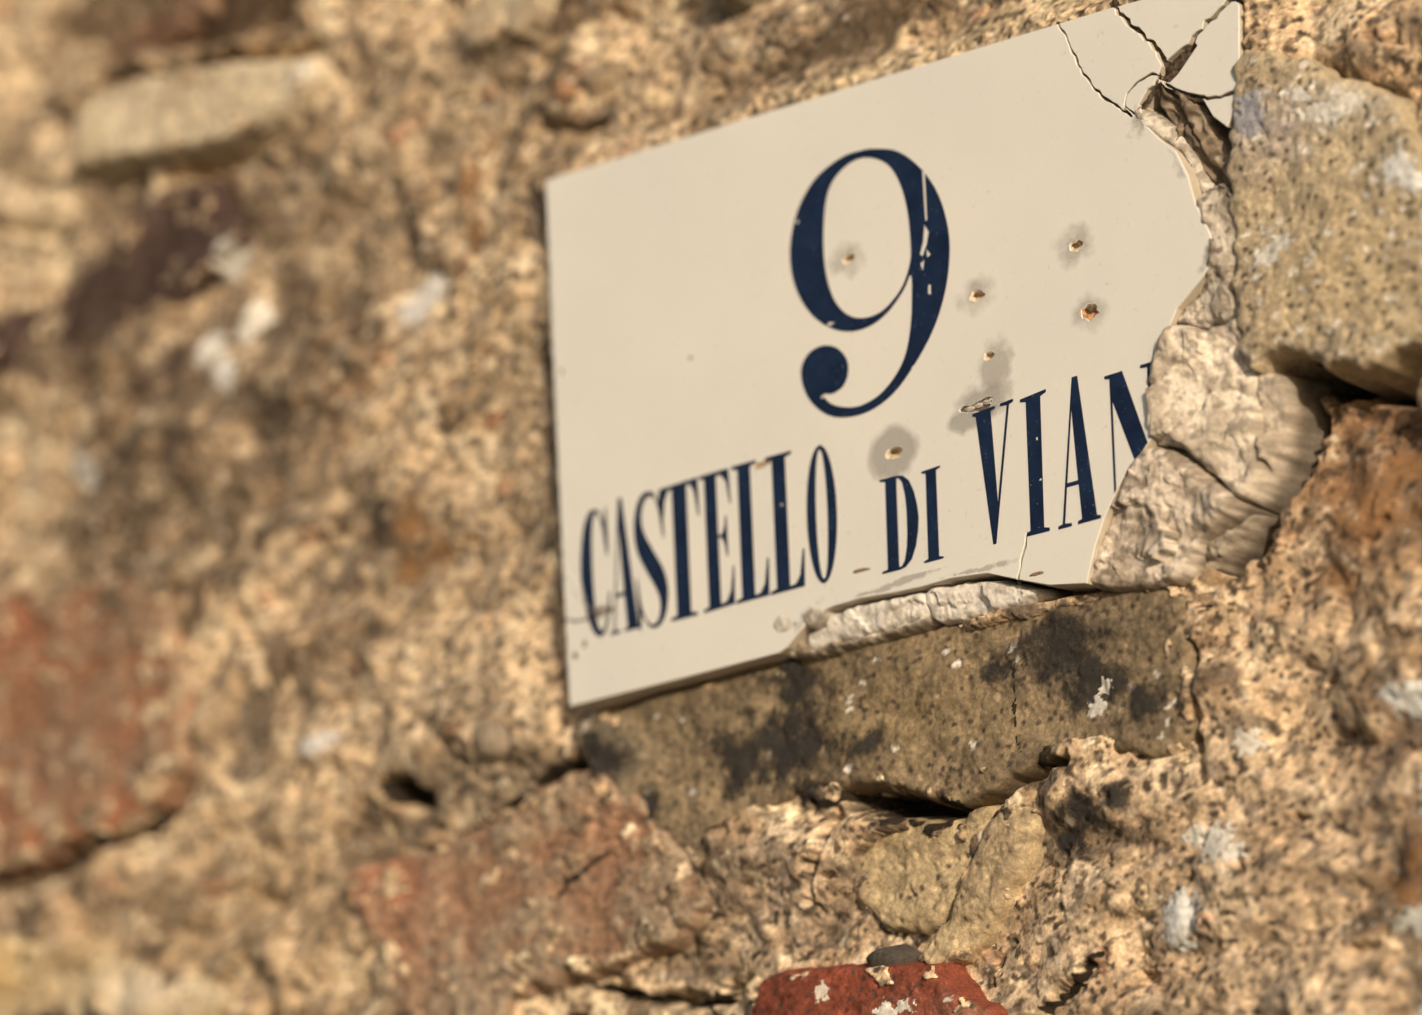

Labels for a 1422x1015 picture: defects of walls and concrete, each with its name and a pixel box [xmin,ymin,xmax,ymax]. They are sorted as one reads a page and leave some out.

crack [1055,0,1244,117]
leakage [582,730,630,785]
leakage [636,785,659,823]
leakage [712,658,883,813]